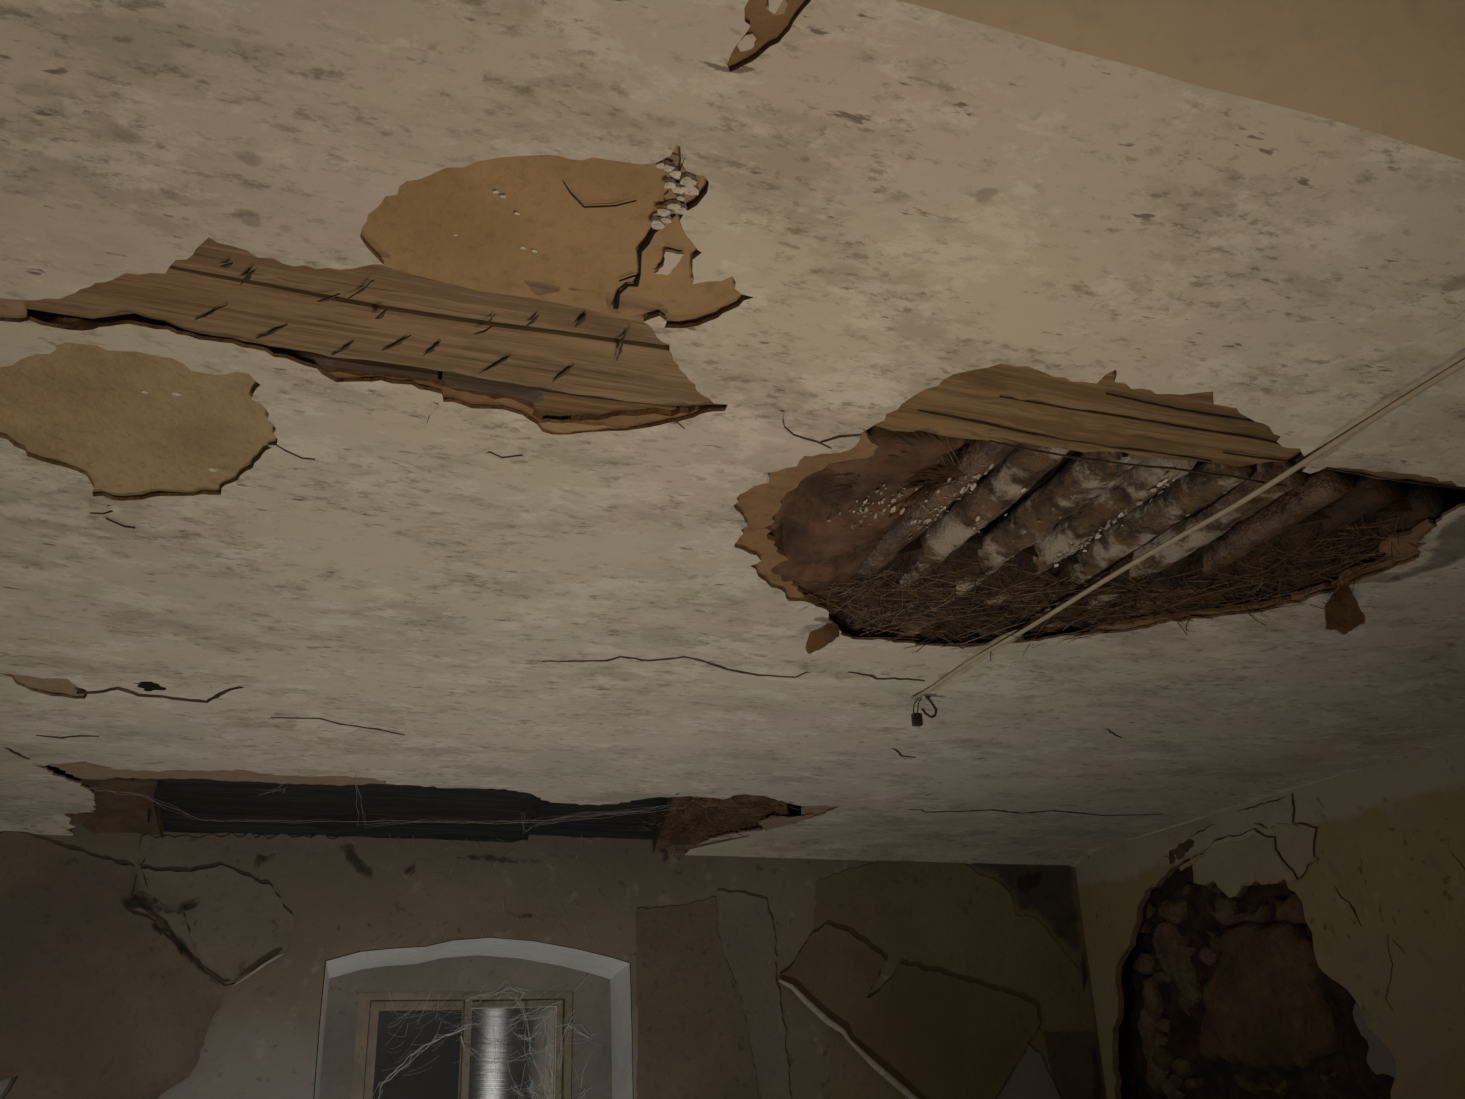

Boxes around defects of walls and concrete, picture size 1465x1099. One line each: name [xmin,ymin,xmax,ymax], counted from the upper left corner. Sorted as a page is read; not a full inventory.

flaking render [728,0,807,68]
flaking render [361,145,746,325]
flaking render [0,317,277,497]
flaking render [321,367,726,433]
flaking render [735,426,966,654]
flaking render [1092,488,1465,635]
crack [542,656,809,678]
crack [846,671,925,682]
flaking render [49,761,388,839]
flaking render [653,794,836,854]
crack [909,794,1405,1012]
spalling [1118,824,1396,1099]